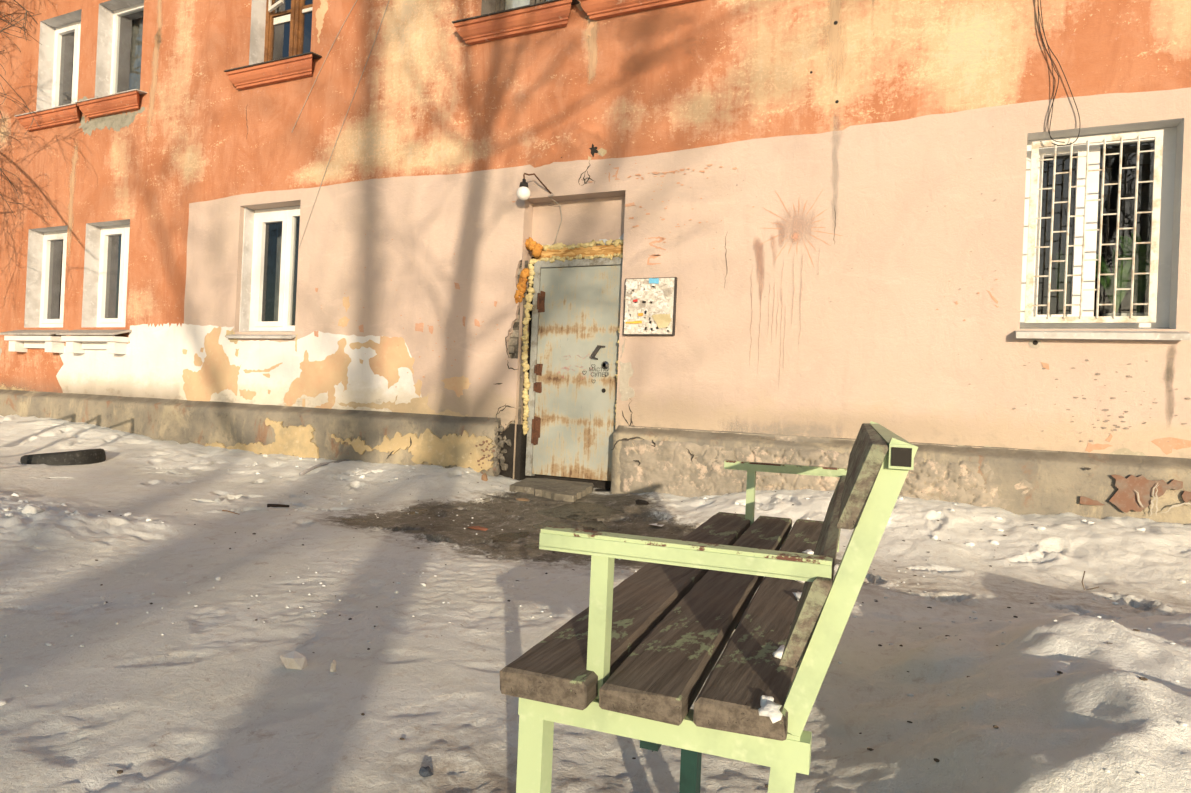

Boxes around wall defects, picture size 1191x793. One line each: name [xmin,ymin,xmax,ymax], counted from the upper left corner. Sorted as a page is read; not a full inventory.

peeling [182,327,282,401]
peeling [205,418,319,459]
peeling [283,293,511,476]
peeling [1055,363,1191,456]
peeling [1079,474,1191,513]